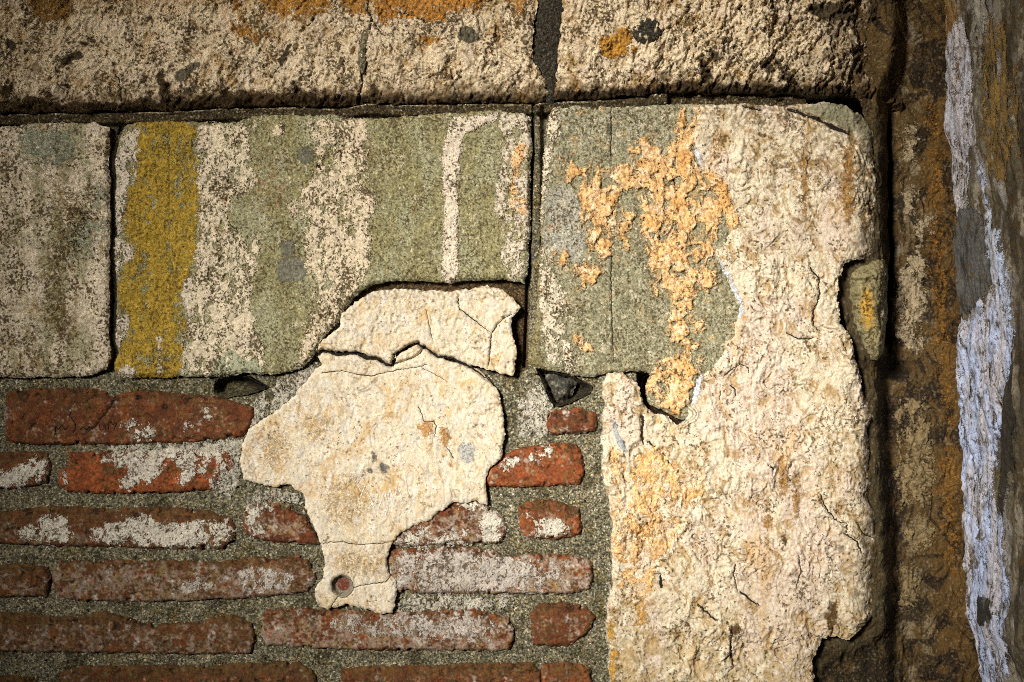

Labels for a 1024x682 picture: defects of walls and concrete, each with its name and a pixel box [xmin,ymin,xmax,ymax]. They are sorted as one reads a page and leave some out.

crack [744,107,851,135]
crack [787,266,847,351]
crack [316,298,512,381]
crack [719,364,749,400]
crack [820,494,874,553]
crack [733,564,760,606]
crack [697,604,734,667]